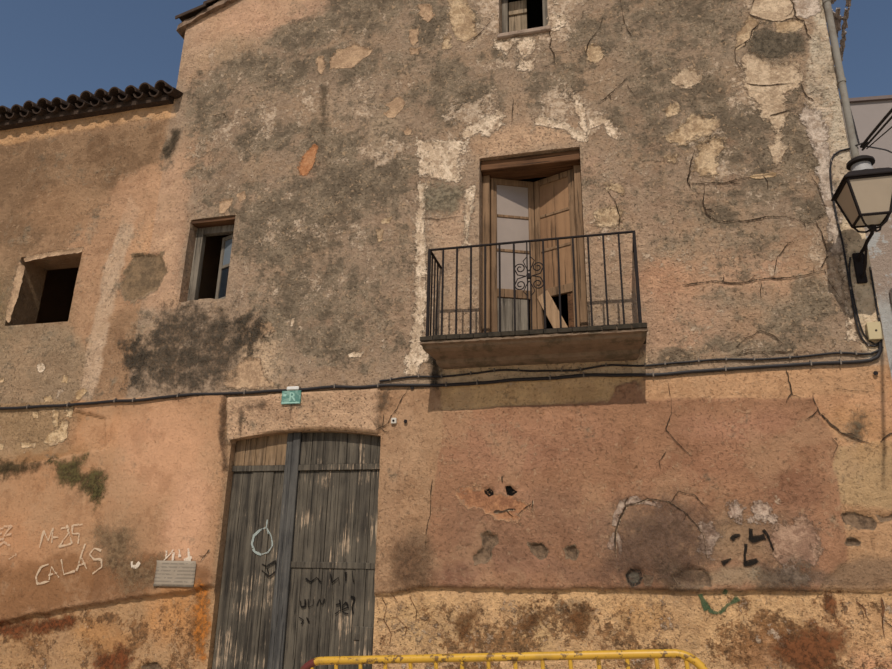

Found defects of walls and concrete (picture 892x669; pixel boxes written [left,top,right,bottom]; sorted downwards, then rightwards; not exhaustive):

flaking render [493,34,537,72]
crack [545,0,631,67]
crack [734,0,817,103]
flaking render [534,89,622,142]
flaking render [734,0,861,342]
flaking render [403,107,506,376]
crack [682,150,840,298]
leakage [0,457,52,479]
mould [118,301,269,393]
crack [659,385,694,468]
crack [733,330,892,456]
flaking render [726,499,824,581]